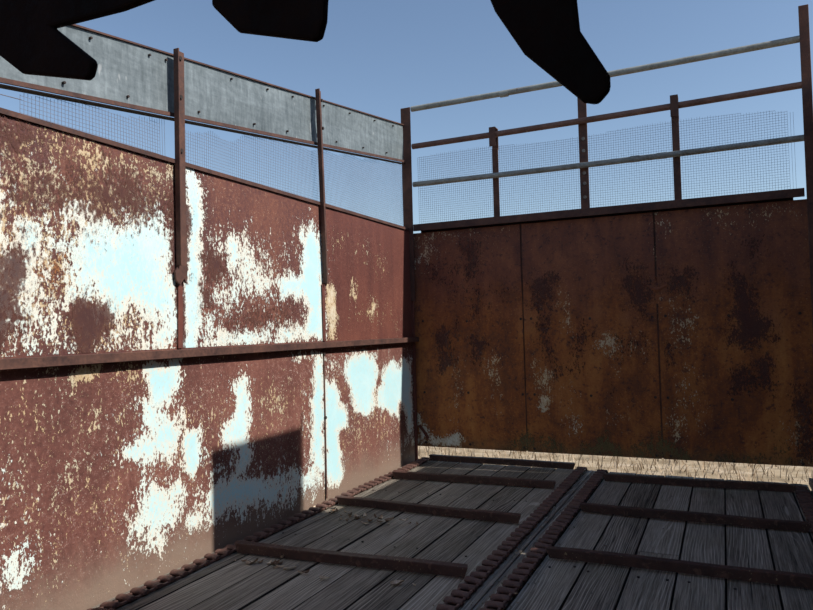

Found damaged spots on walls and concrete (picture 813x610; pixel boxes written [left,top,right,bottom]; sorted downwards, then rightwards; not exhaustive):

rust [0,114,228,354]
peeling [0,125,466,603]
rust [218,296,306,339]